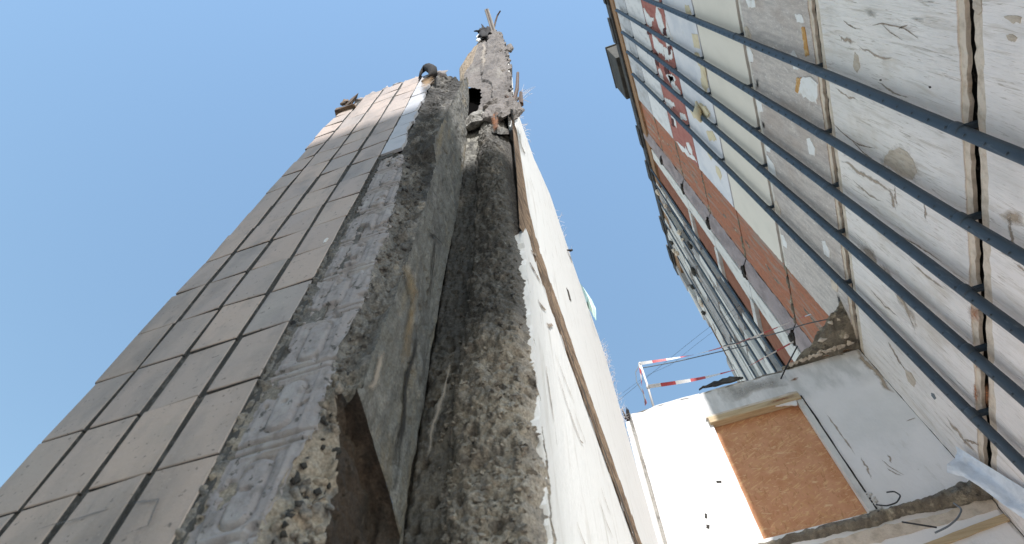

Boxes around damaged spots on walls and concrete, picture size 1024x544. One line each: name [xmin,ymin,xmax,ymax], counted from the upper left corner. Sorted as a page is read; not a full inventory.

peeling [643,0,716,141]
peeling [676,141,722,180]
spalling [254,70,462,544]